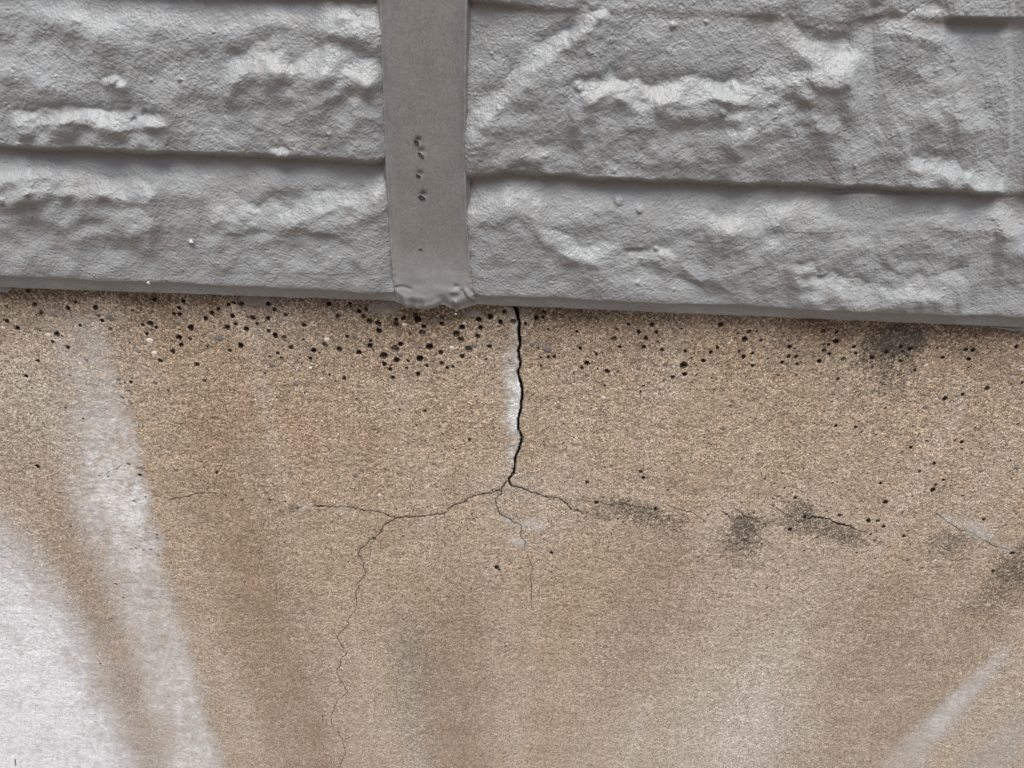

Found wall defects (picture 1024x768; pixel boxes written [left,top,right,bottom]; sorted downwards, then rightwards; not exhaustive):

leakage [0,338,222,768]
crack [296,306,865,766]